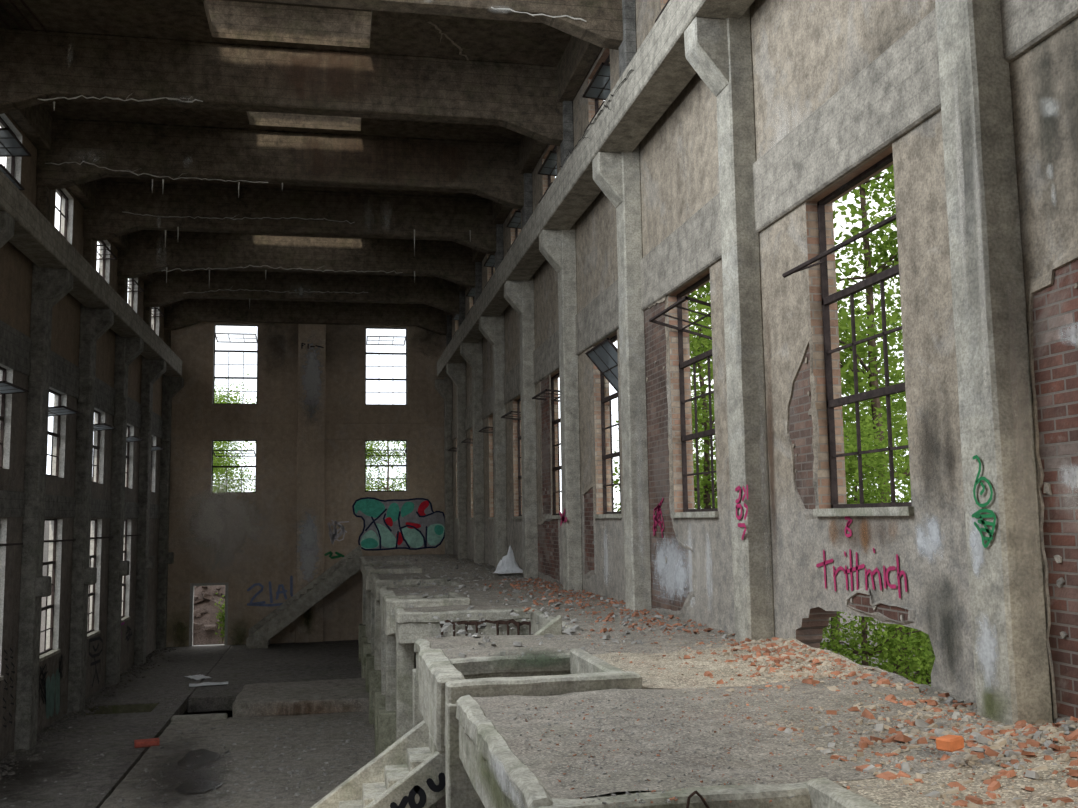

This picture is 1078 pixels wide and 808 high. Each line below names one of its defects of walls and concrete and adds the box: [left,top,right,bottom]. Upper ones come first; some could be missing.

flaking render [785,332,819,520]
flaking render [1028,242,1078,723]
flaking render [845,588,916,625]